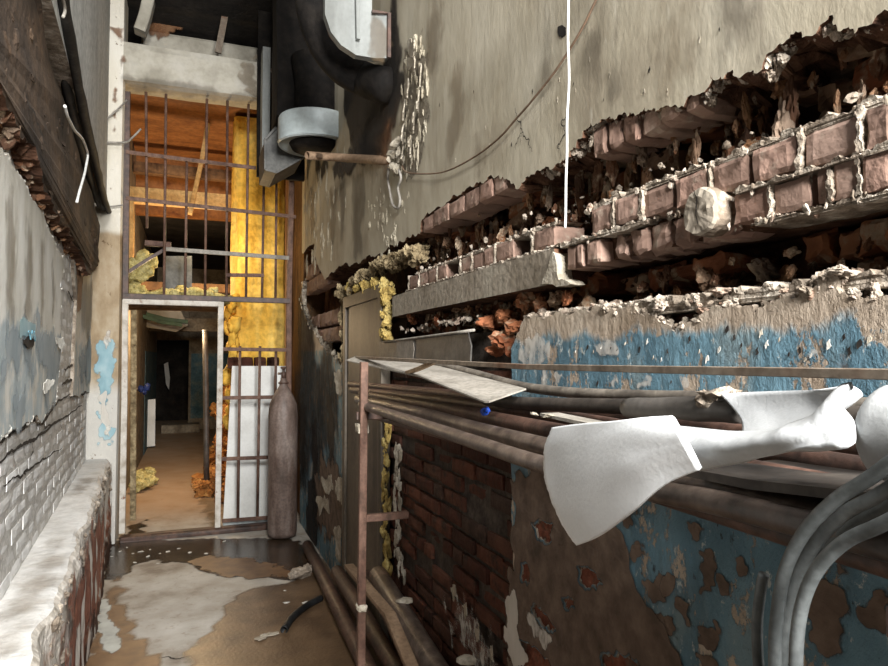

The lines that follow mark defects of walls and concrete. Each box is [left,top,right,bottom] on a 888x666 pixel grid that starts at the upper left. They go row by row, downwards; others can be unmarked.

peeling [367,188,409,259]
spalling [400,16,888,385]
peeling [0,309,65,441]
crack [0,364,86,487]
peeling [80,331,117,446]
spalling [299,263,343,396]
leakage [75,463,357,666]
peeling [305,450,342,564]
leakage [366,637,383,666]
peeling [506,469,721,666]
peeling [687,521,729,596]
peeling [808,563,888,658]